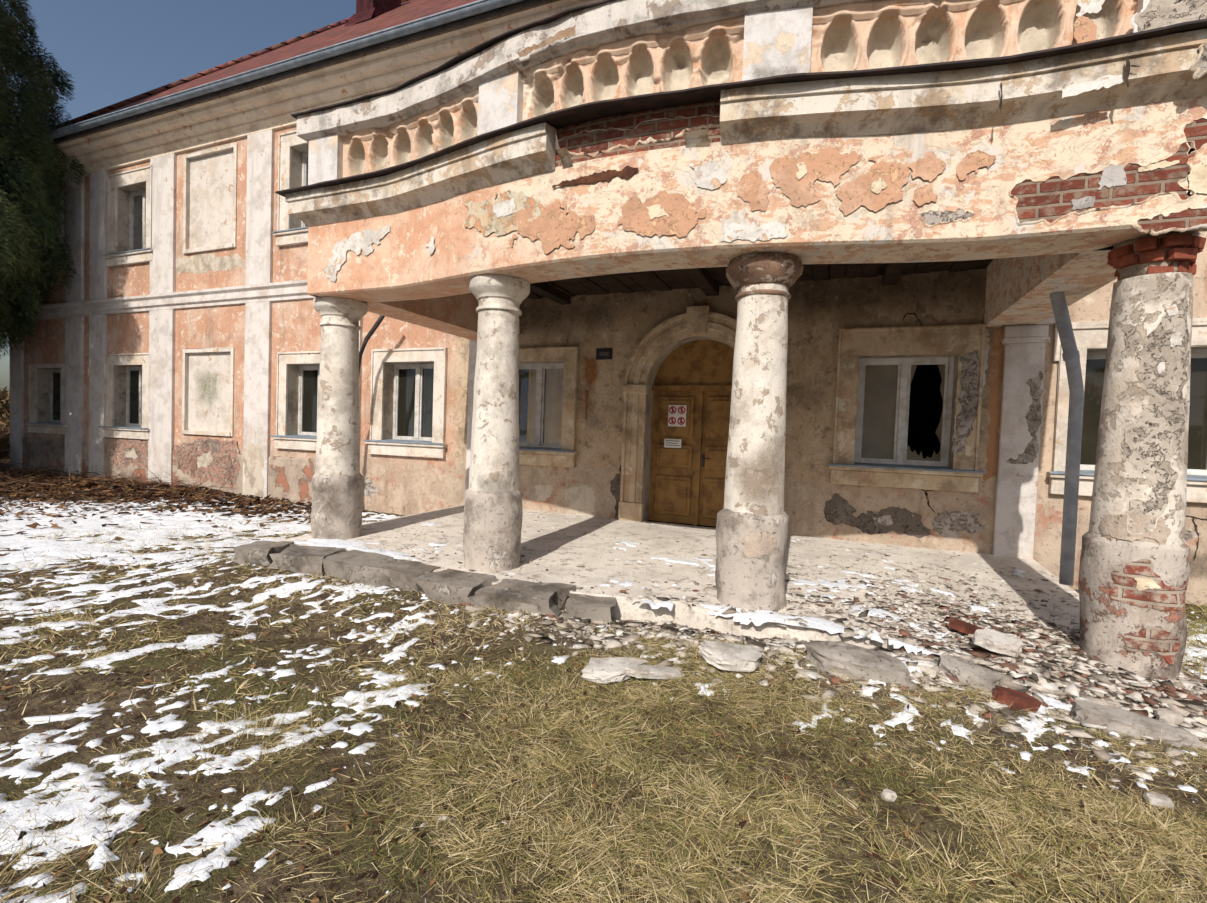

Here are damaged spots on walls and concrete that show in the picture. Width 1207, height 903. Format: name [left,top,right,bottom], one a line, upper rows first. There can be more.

flaking render [1130,0,1207,33]
flaking render [555,114,720,157]
peeling [464,190,595,254]
peeling [617,190,706,238]
peeling [689,147,996,228]
flaking render [1008,117,1207,236]
peeling [324,224,390,282]
peeling [952,329,1045,480]
peeling [1099,286,1200,544]
flaking render [823,492,986,539]
crack [1186,515,1207,561]
flaking render [1109,559,1187,611]